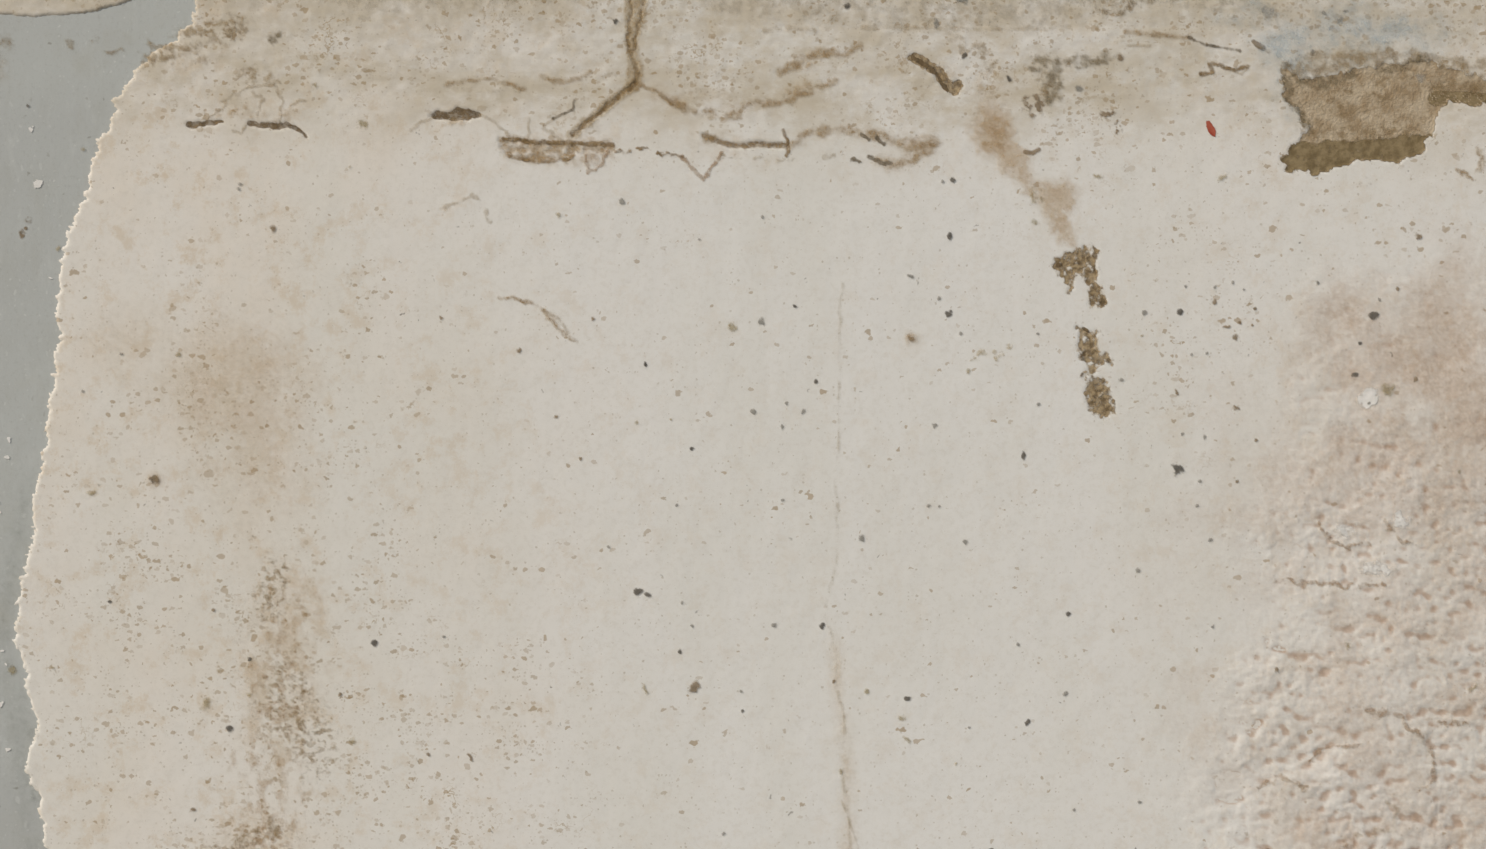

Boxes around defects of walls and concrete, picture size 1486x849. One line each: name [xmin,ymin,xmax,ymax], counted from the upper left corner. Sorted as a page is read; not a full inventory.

crack [469,0,656,136]
leakage [1024,55,1123,117]
flaking render [1279,48,1486,176]